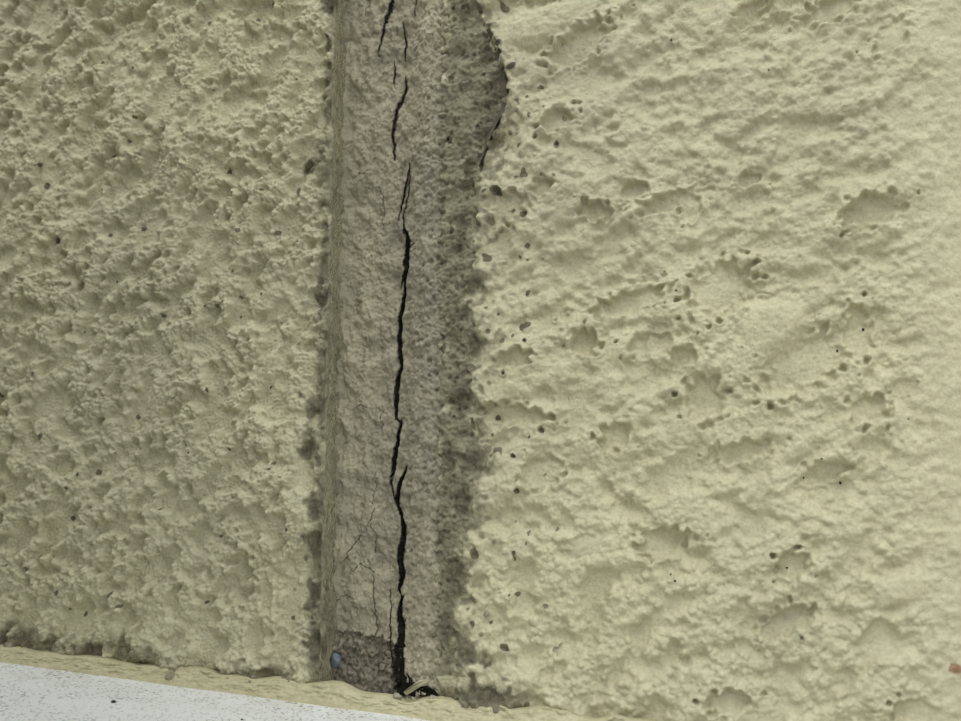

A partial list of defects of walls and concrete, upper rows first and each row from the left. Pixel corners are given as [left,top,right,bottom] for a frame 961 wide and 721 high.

crack [336,0,417,695]